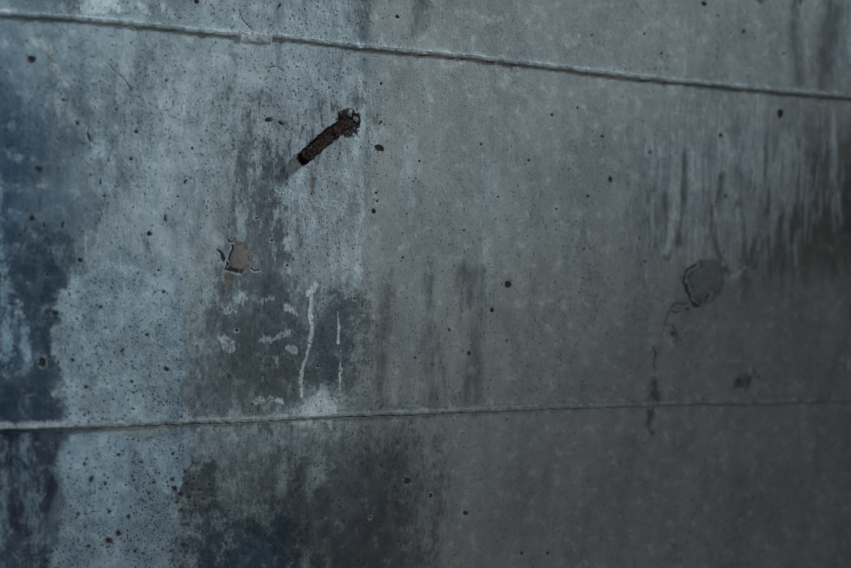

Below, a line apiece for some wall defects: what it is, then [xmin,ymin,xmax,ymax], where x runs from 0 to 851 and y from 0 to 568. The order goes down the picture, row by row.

leakage [0,9,239,33]
rust [298,111,361,165]
leakage [259,0,851,294]
flaking render [216,239,260,275]
leakage [82,42,843,422]
leakage [0,223,78,568]
leakage [181,419,421,568]